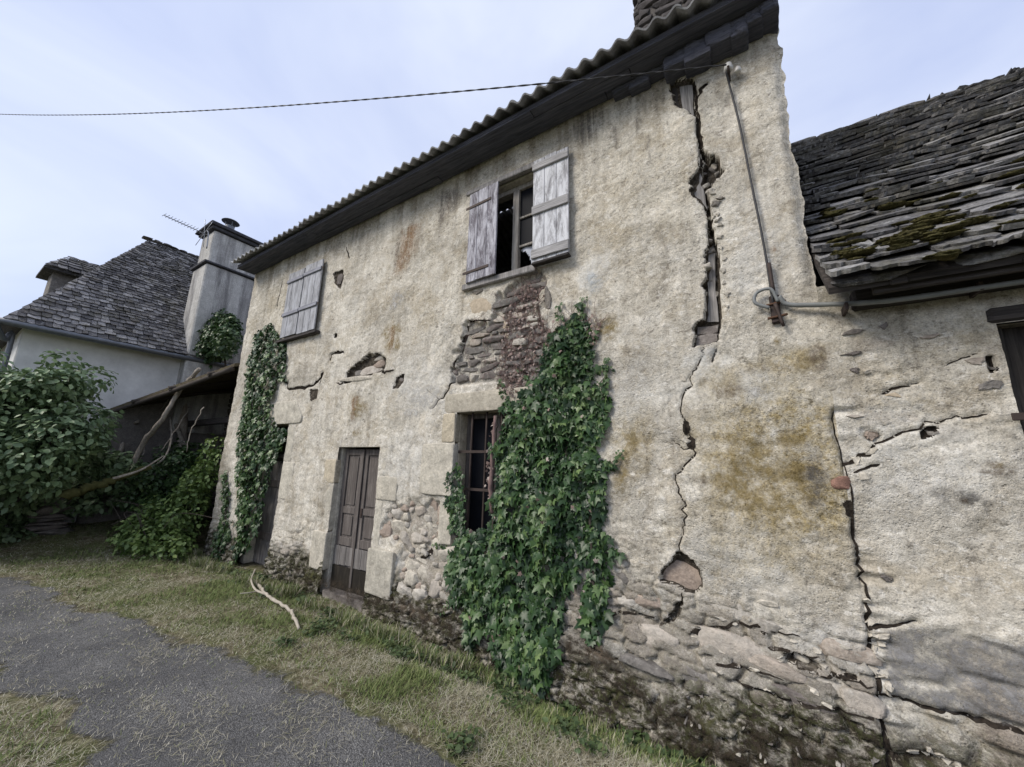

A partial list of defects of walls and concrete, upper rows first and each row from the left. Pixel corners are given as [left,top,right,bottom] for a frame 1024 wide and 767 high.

spalling [338,352,439,416]
spalling [450,266,556,387]
crack [669,78,731,551]
flaking render [379,499,456,608]
flaking render [592,551,887,721]
crack [831,411,1024,767]